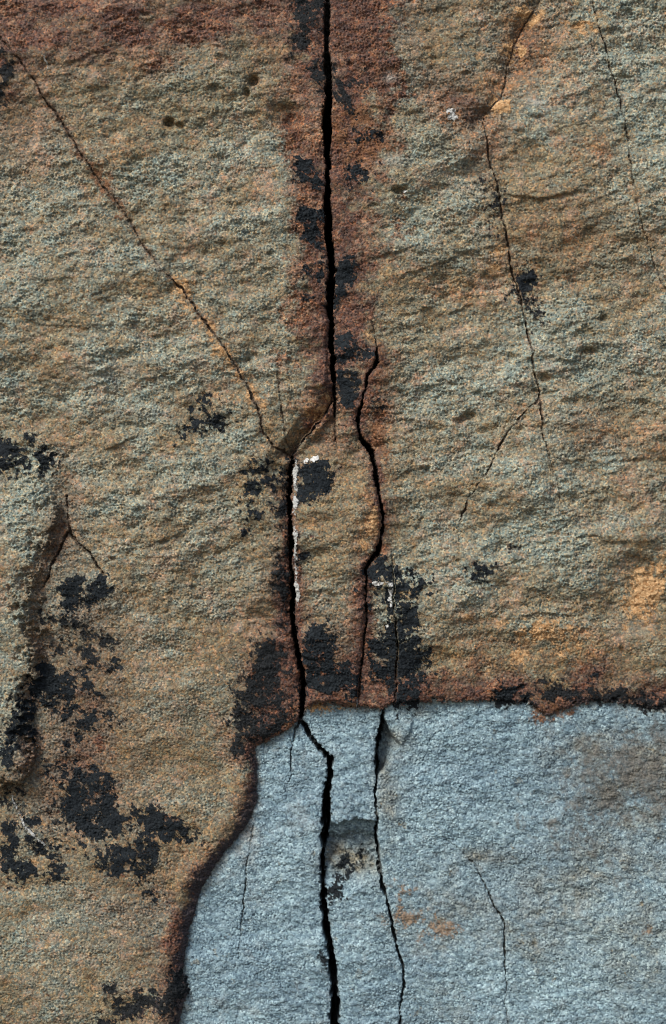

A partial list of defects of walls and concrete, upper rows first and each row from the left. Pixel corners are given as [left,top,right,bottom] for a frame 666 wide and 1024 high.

crack [0,0,406,1024]
crack [457,0,569,556]
spalling [179,698,666,1024]
crack [415,788,510,1024]